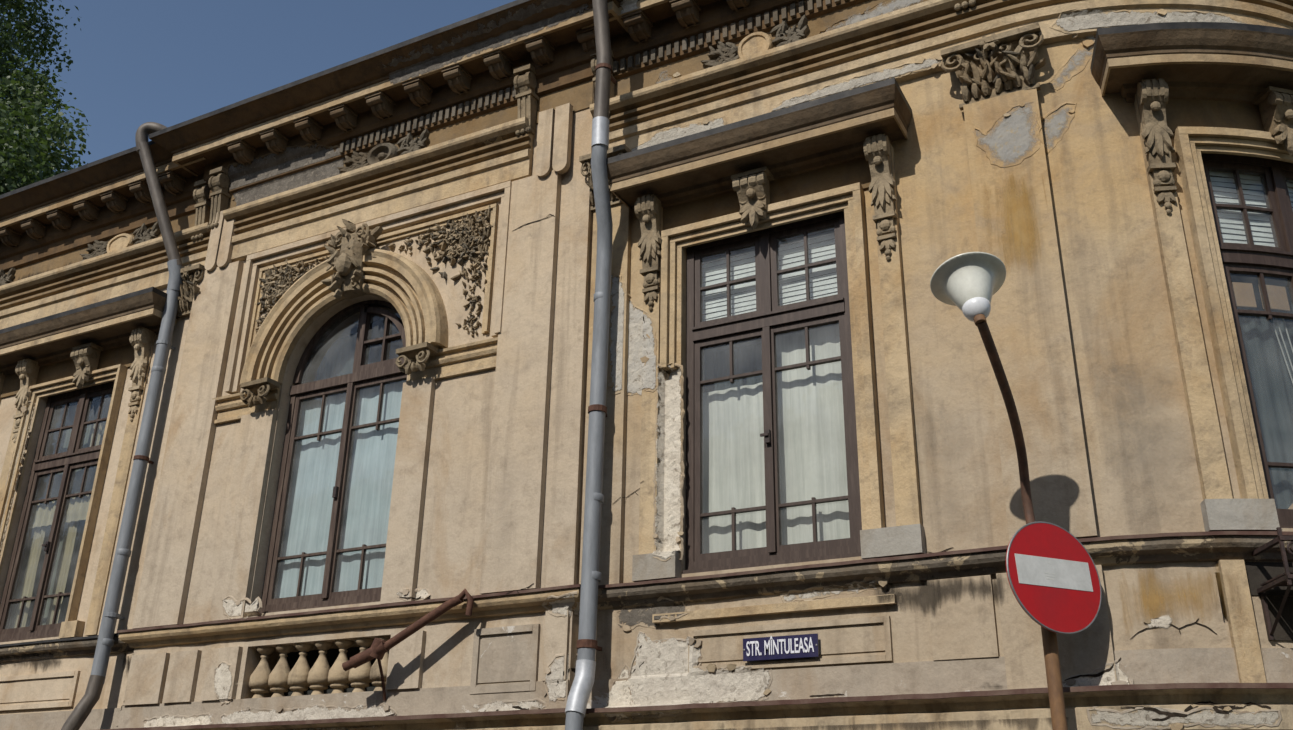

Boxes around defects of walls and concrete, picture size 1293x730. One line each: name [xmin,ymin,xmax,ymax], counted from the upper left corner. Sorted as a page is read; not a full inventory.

spalling [975,8,1246,168]
spalling [607,272,685,562]
spalling [140,661,397,730]
spalling [473,651,578,712]
spalling [604,594,773,723]
spalling [1062,657,1282,730]
crack [1131,618,1217,639]